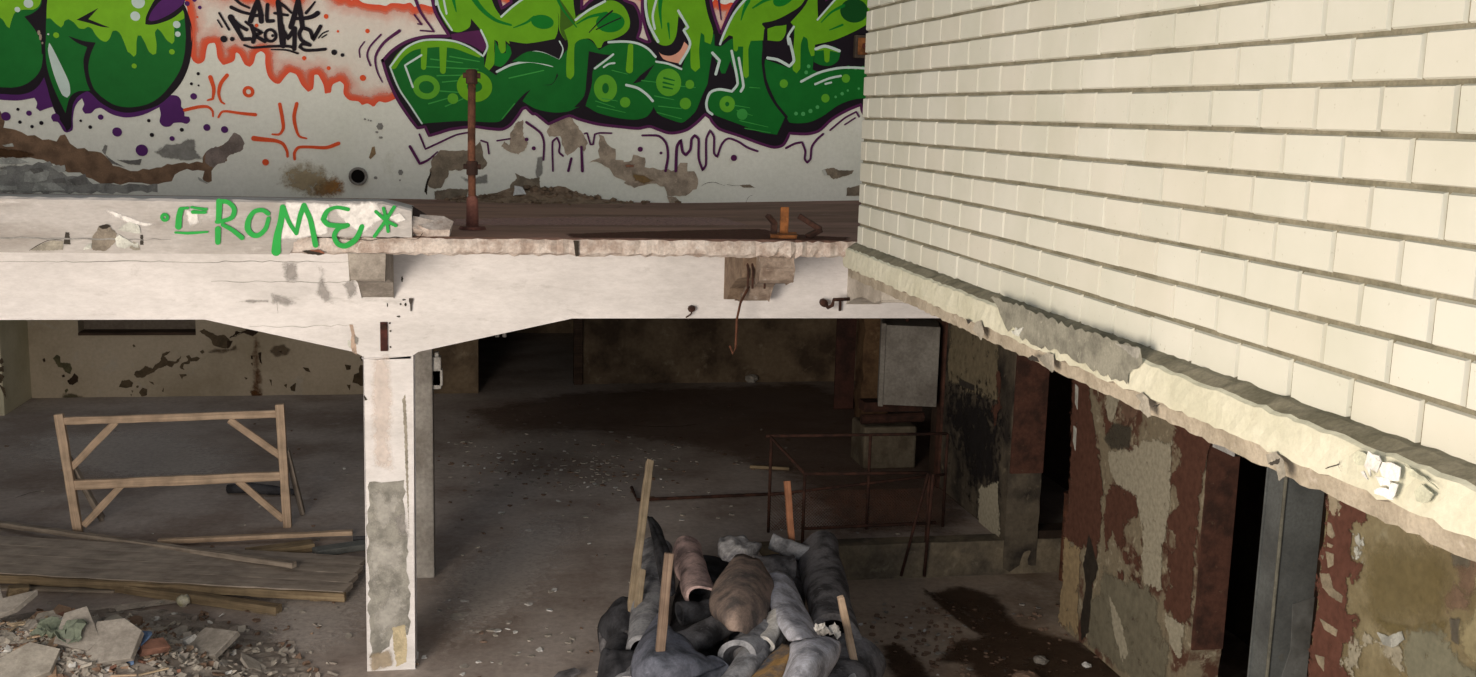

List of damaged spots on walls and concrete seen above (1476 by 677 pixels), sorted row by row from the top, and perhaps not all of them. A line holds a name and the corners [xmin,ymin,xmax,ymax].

spalling [0,112,245,194]
spalling [424,142,487,200]
spalling [502,120,543,188]
spalling [547,117,698,203]
spalling [822,168,860,196]
peeling [119,329,258,397]
peeling [345,356,367,400]
peeling [945,296,1211,636]
peeling [1352,451,1439,503]
peeling [366,395,411,670]
flaking render [1282,495,1404,677]
peeling [1444,554,1476,663]